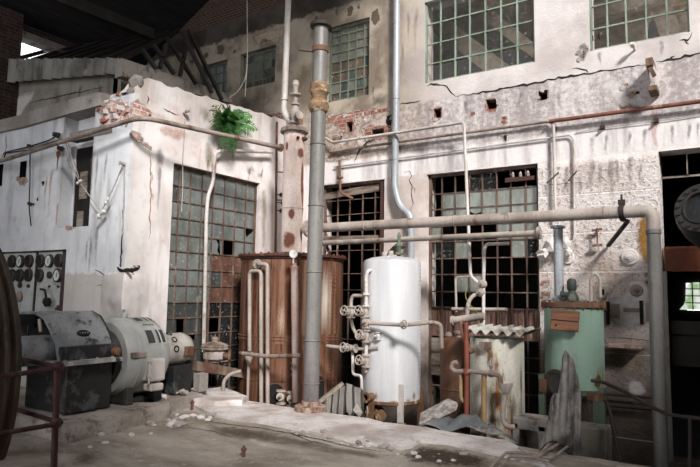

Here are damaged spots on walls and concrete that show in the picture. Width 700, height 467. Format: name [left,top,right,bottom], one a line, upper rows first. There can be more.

crack [428,33,700,97]
flaking render [100,74,152,150]
flaking render [325,107,392,162]
flaking render [484,96,508,124]
crack [147,158,155,237]